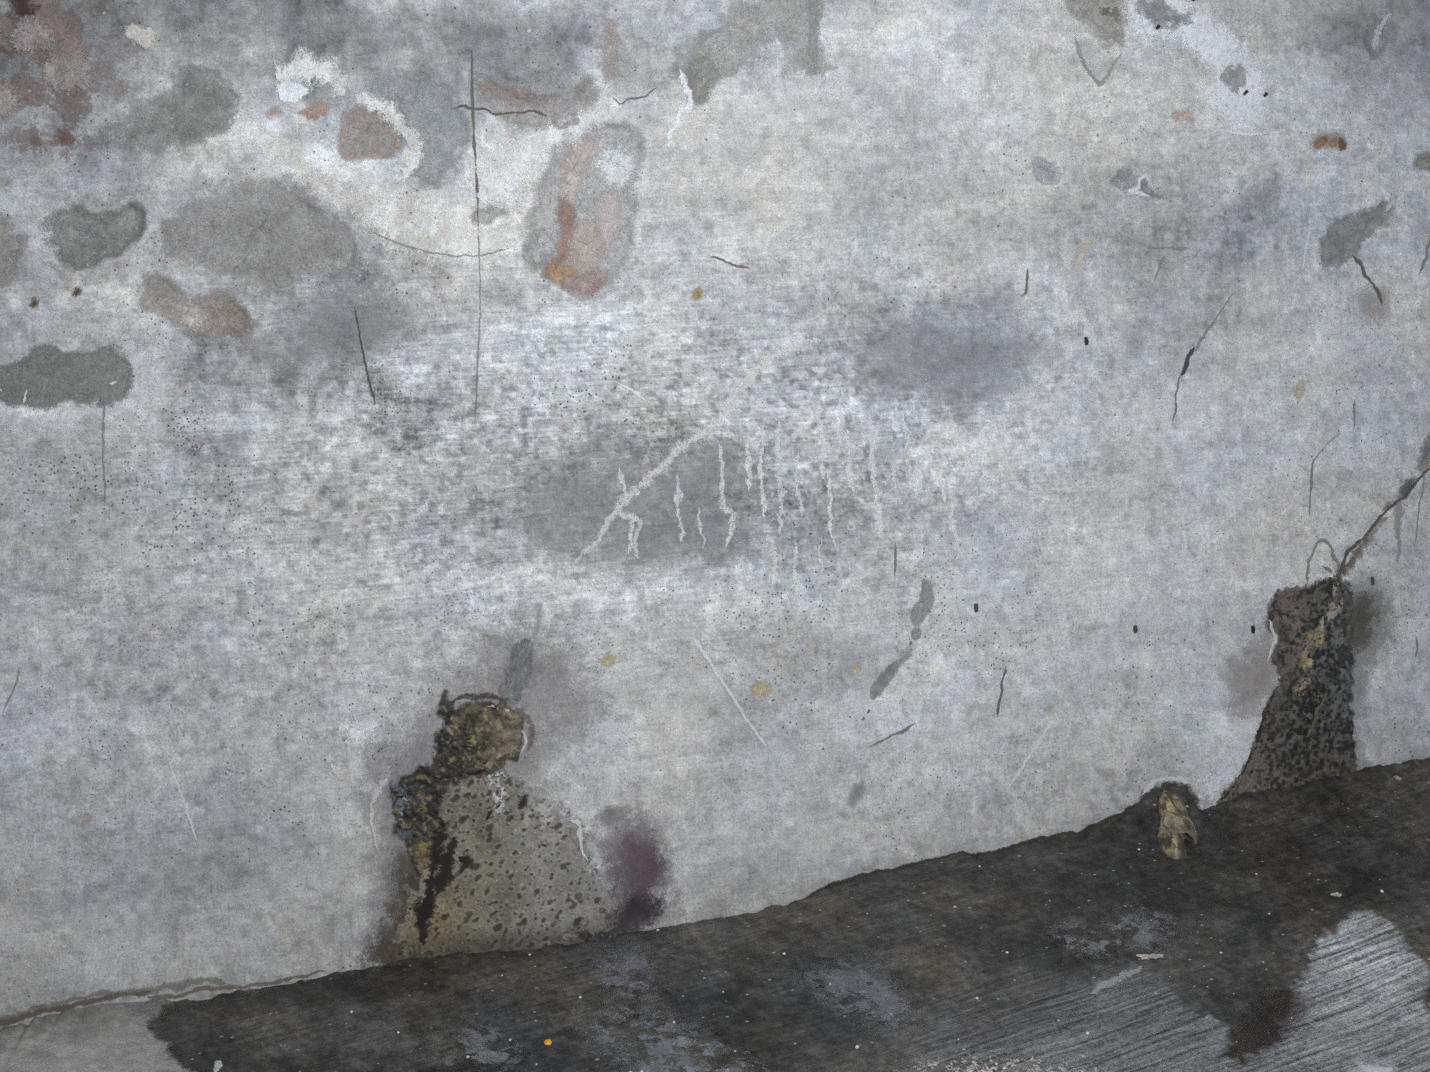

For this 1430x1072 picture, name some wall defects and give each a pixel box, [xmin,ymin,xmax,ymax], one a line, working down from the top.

leakage [674,475,706,547]
leakage [717,440,736,546]
leakage [744,419,804,599]
leakage [818,387,959,576]
crack [1305,398,1430,586]
leakage [146,577,1430,1072]